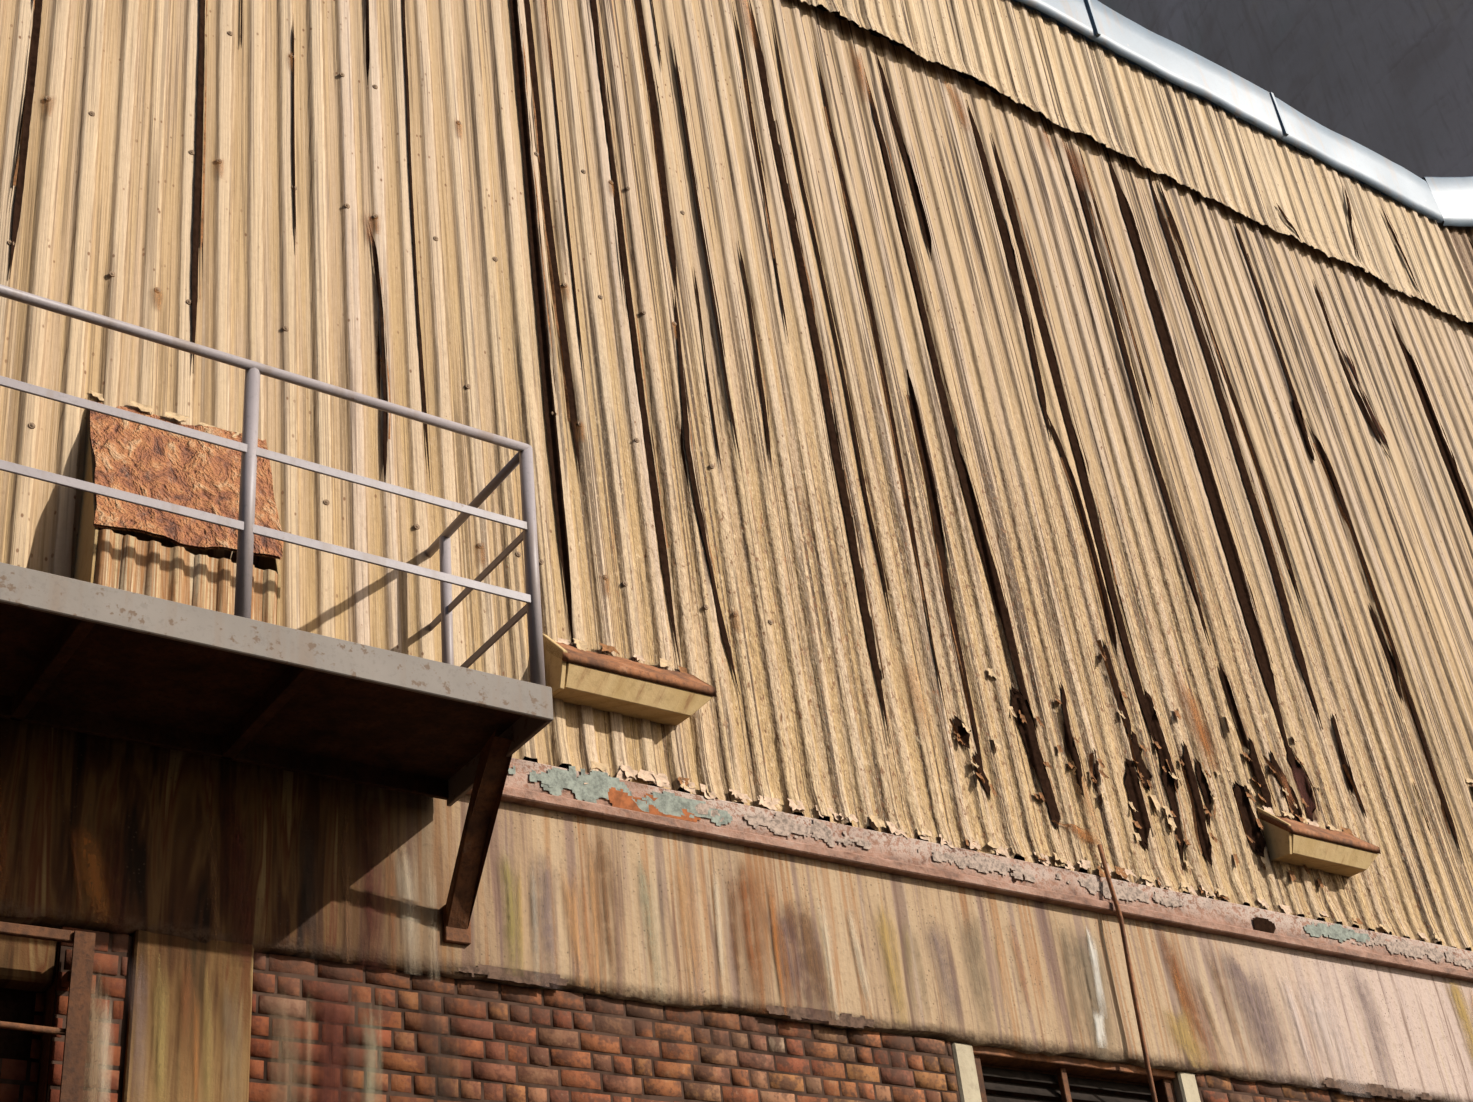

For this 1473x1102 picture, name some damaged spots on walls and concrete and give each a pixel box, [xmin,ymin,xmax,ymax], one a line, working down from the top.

peeling [954,723,998,797]
peeling [1009,706,1045,729]
peeling [508,737,1232,907]
peeling [1242,752,1354,869]
damp [779,914,836,1007]
damp [850,916,869,996]
damp [1077,930,1107,1056]
rust [1163,936,1221,1054]
peeling [1257,898,1292,914]
peeling [1304,911,1473,969]